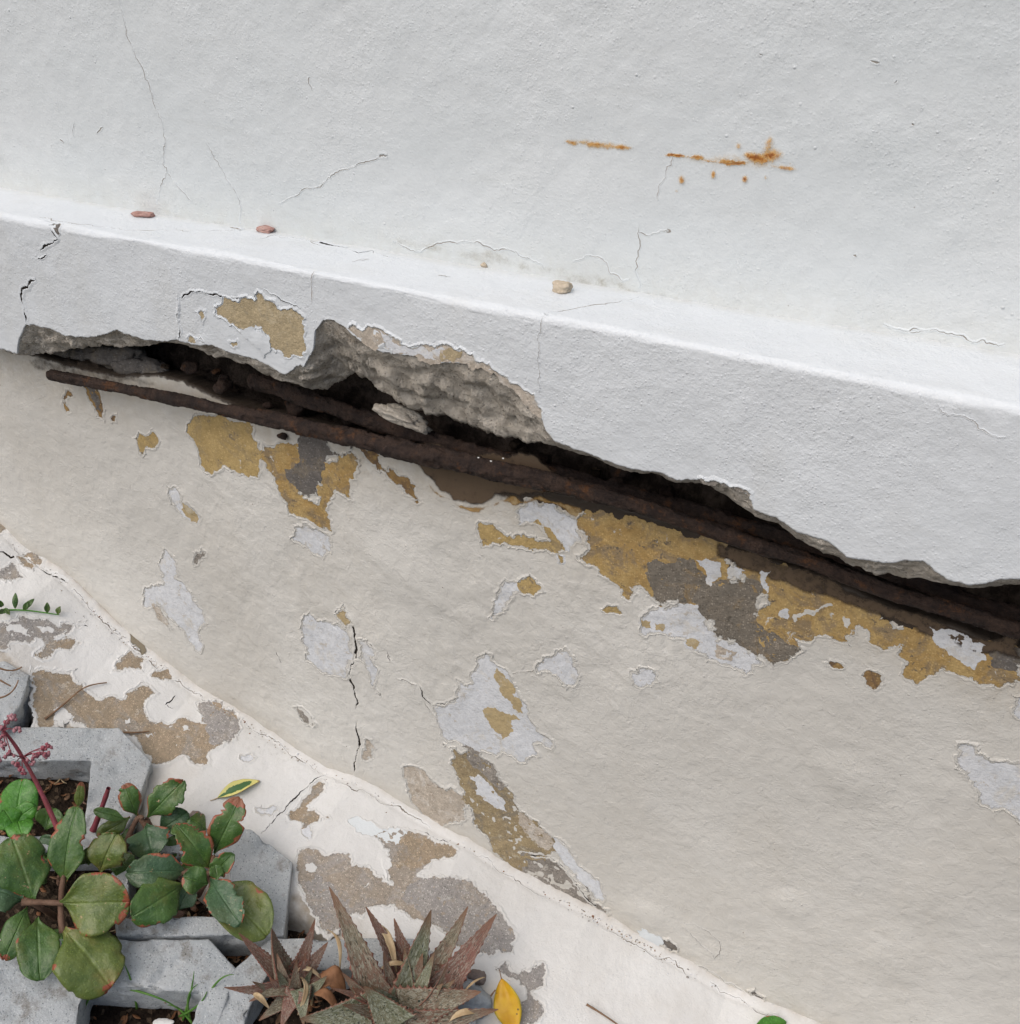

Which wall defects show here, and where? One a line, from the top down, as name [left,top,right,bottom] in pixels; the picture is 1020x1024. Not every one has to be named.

crack [118,0,192,205]
crack [18,143,545,342]
rust [566,141,629,149]
crack [536,224,671,393]
rust [666,138,793,182]
spalling [0,288,1020,605]
peeling [0,612,259,770]
peeling [141,546,208,654]
peeling [298,602,381,695]
crack [0,547,778,1016]
spalling [400,649,612,917]
peeling [252,778,549,1024]